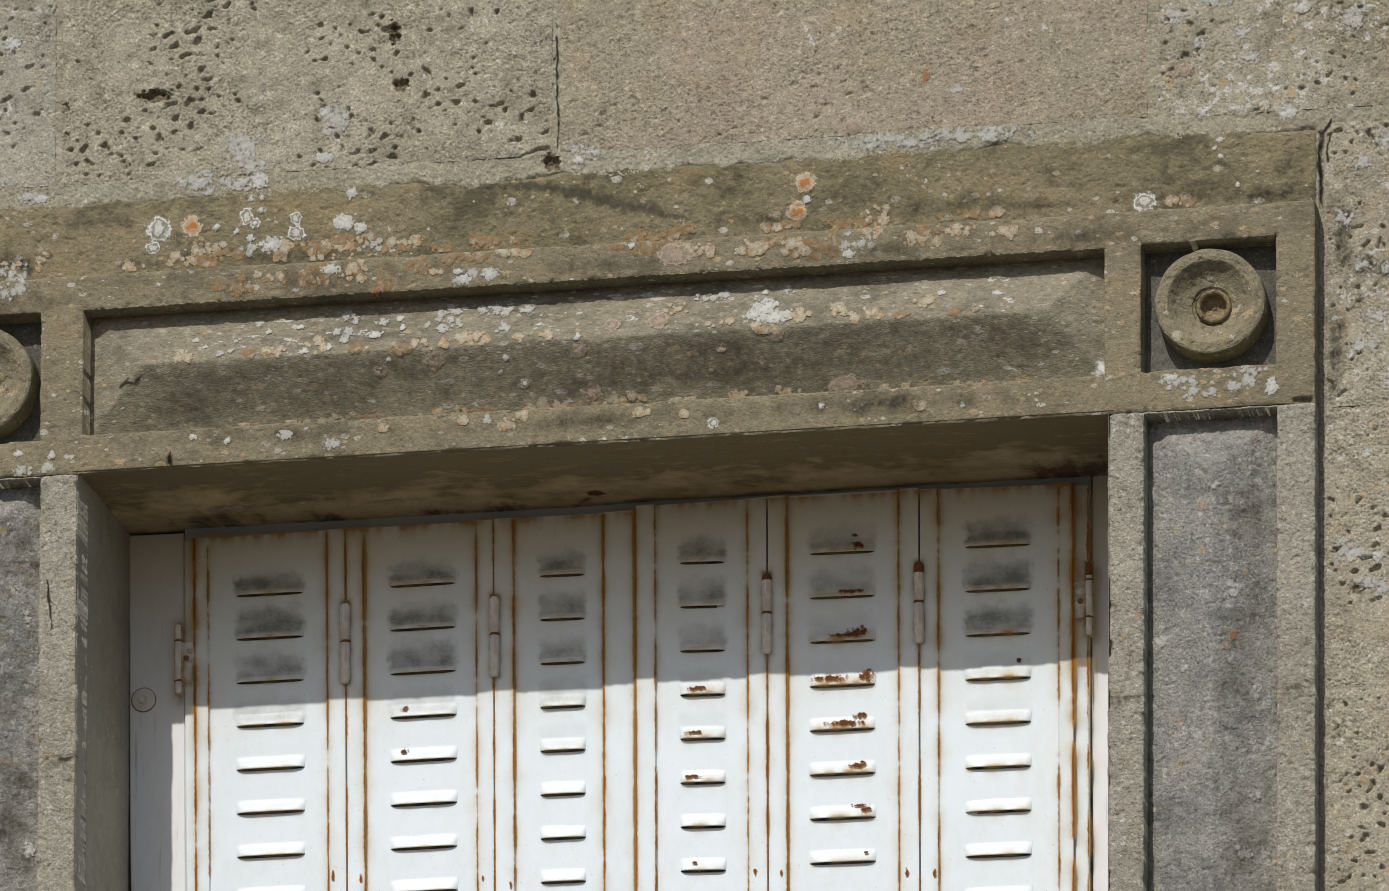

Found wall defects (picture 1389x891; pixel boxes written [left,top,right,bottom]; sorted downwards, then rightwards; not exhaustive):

leakage [75,394,1113,534]
corrosion [174,532,285,891]
corrosion [305,526,380,891]
corrosion [570,491,638,891]
corrosion [811,668,874,686]
corrosion [819,712,867,731]
corrosion [829,625,867,642]